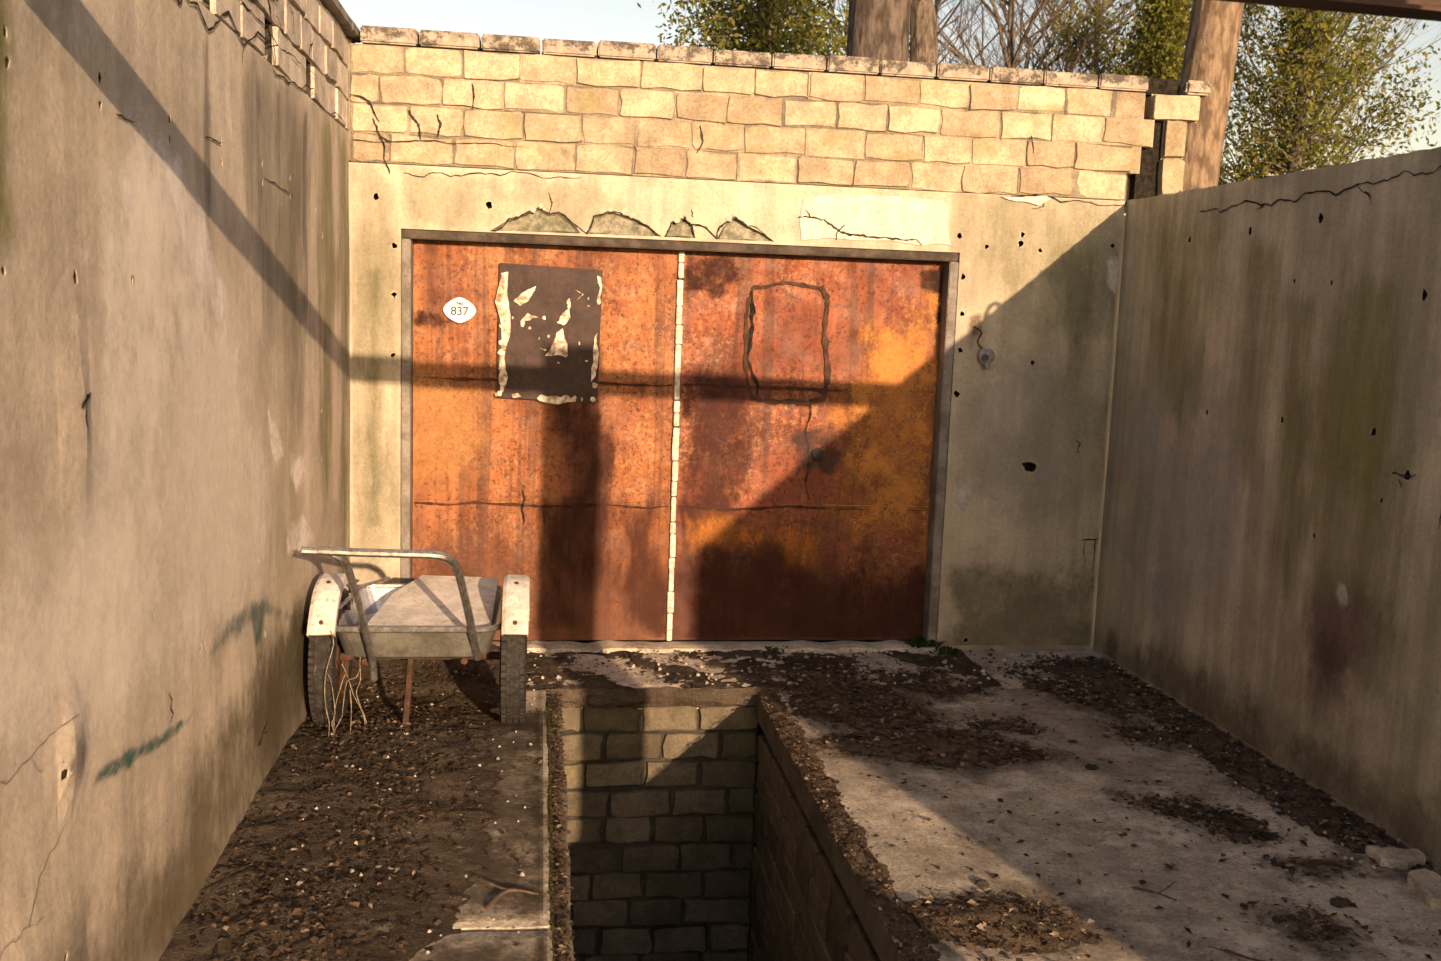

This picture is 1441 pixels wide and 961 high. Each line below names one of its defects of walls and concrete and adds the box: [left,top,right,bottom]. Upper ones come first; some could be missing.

crack [176,0,766,239]
crack [1200,165,1441,213]
spalling [492,203,695,238]
spalling [718,213,773,242]
crack [798,210,922,245]
rust [415,310,449,327]
rust [686,255,738,297]
rust [922,270,943,323]
rust [793,426,841,473]
rust [415,501,691,509]
crack [1,715,79,785]
crack [0,828,64,958]